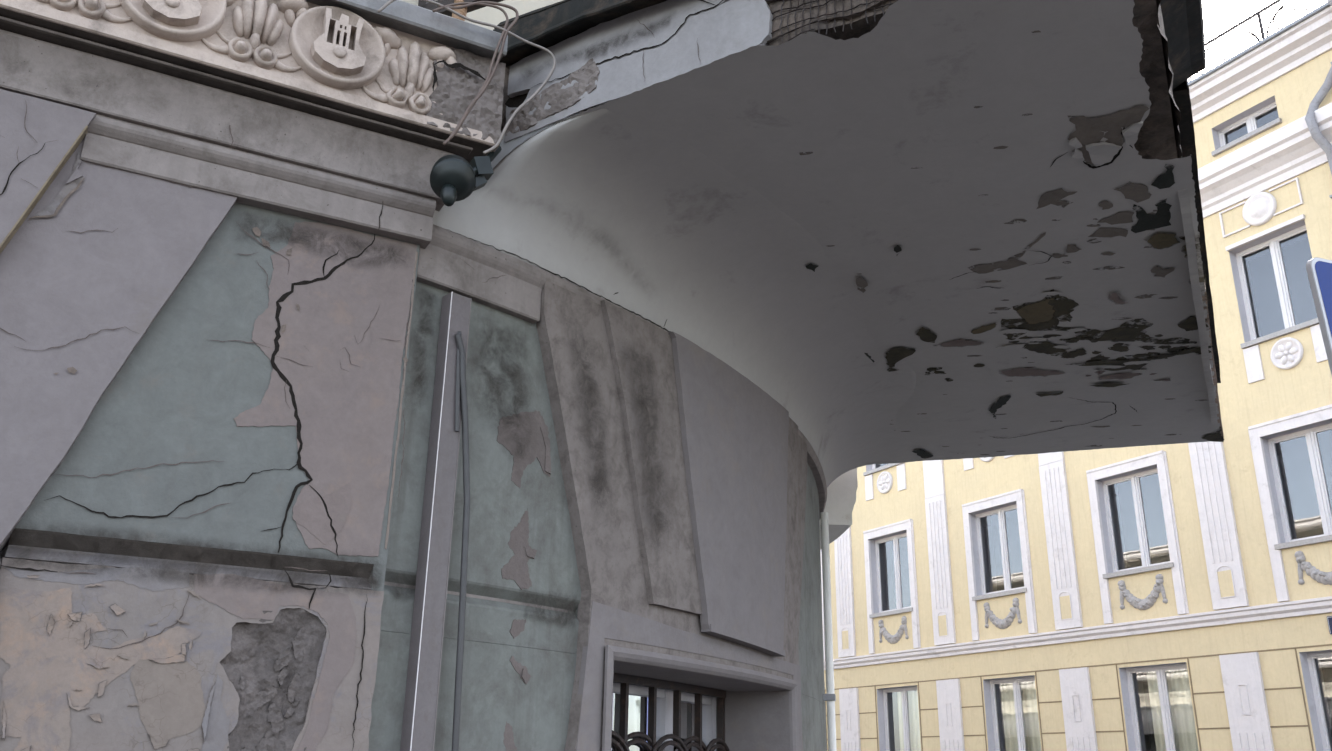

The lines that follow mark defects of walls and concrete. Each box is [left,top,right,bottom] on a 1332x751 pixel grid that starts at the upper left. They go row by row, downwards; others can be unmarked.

crack [0,100,56,195]
crack [432,60,490,91]
spalling [426,45,600,147]
crack [533,0,723,87]
peeling [765,0,897,46]
spalling [1068,105,1150,169]
peeling [1156,0,1183,158]
peeling [1051,181,1157,264]
crack [44,205,415,609]
crack [0,565,94,574]
peeling [0,567,357,751]
crack [352,594,367,750]